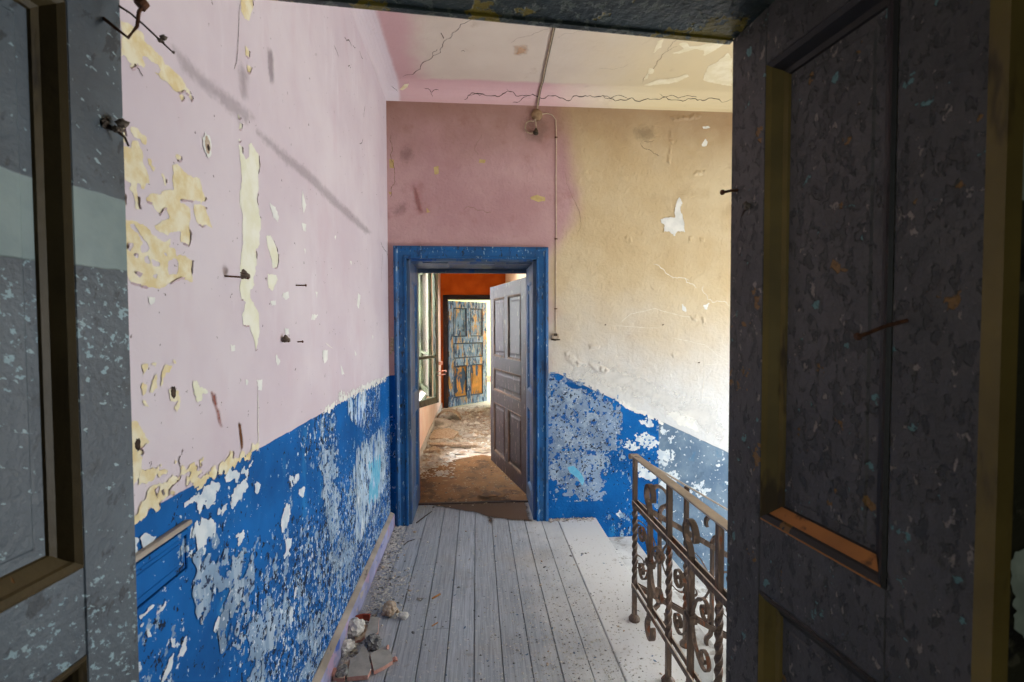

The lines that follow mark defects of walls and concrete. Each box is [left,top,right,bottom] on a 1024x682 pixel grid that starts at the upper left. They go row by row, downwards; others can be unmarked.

peeling [121,21,194,102]
crack [393,20,470,95]
crack [464,40,731,103]
peeling [674,42,733,86]
peeling [123,127,212,305]
peeling [238,115,289,351]
flaking render [661,197,685,236]
peeling [325,376,386,427]
peeling [549,372,699,502]
peeling [289,473,305,498]
peeling [319,429,386,583]
peeling [132,421,298,682]